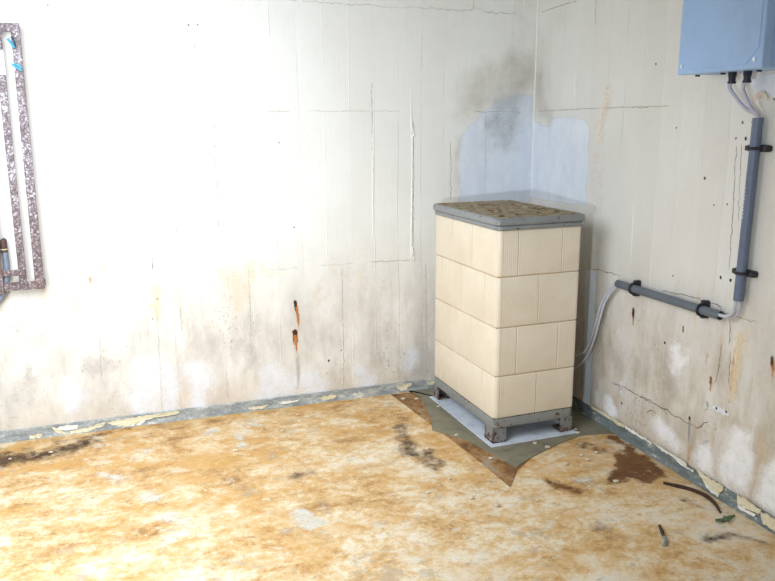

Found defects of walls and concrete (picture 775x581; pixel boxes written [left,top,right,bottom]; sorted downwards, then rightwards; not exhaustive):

crack [291,0,516,14]
peeling [52,411,179,436]
peeling [591,406,723,497]
crack [614,383,708,429]
efflorescence [657,420,677,448]
efflorescence [698,447,711,470]
damp [721,430,775,510]
peeling [737,494,775,531]